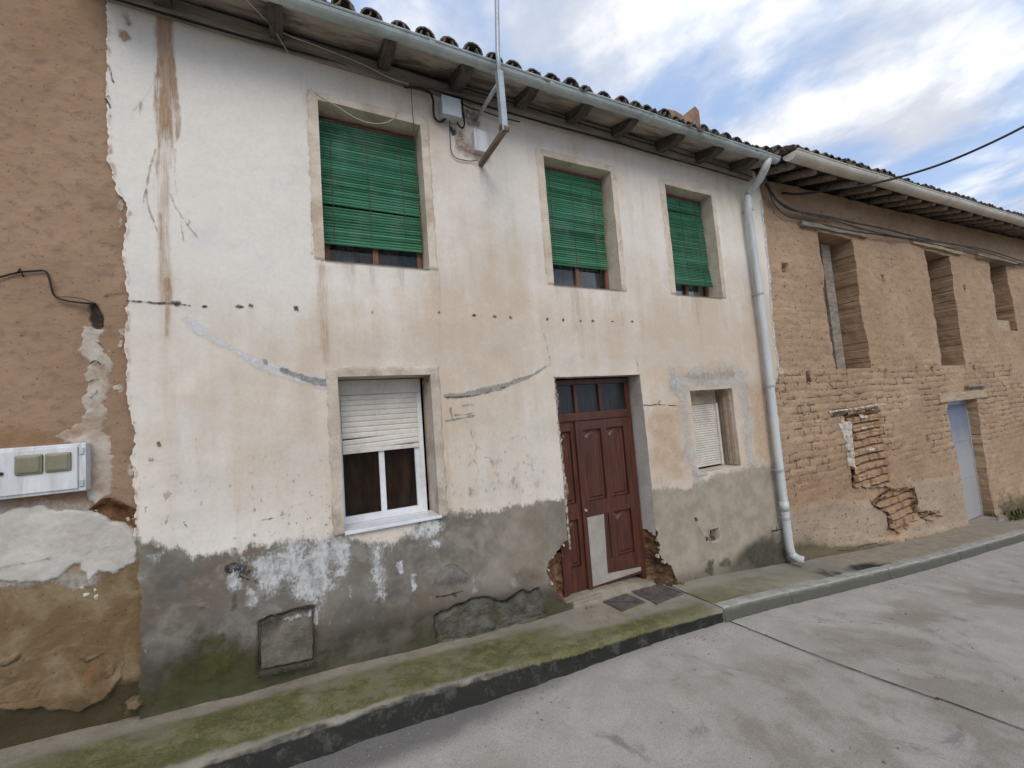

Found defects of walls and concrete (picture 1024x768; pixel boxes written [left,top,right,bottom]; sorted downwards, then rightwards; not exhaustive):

crack [127,300,326,388]
flaking render [0,322,139,600]
flaking render [829,403,942,533]
peeling [227,535,351,625]
peeling [371,542,418,598]
flaking render [434,385,571,643]
flaking render [643,528,678,587]
flaking render [0,643,125,712]
peeling [125,695,143,710]